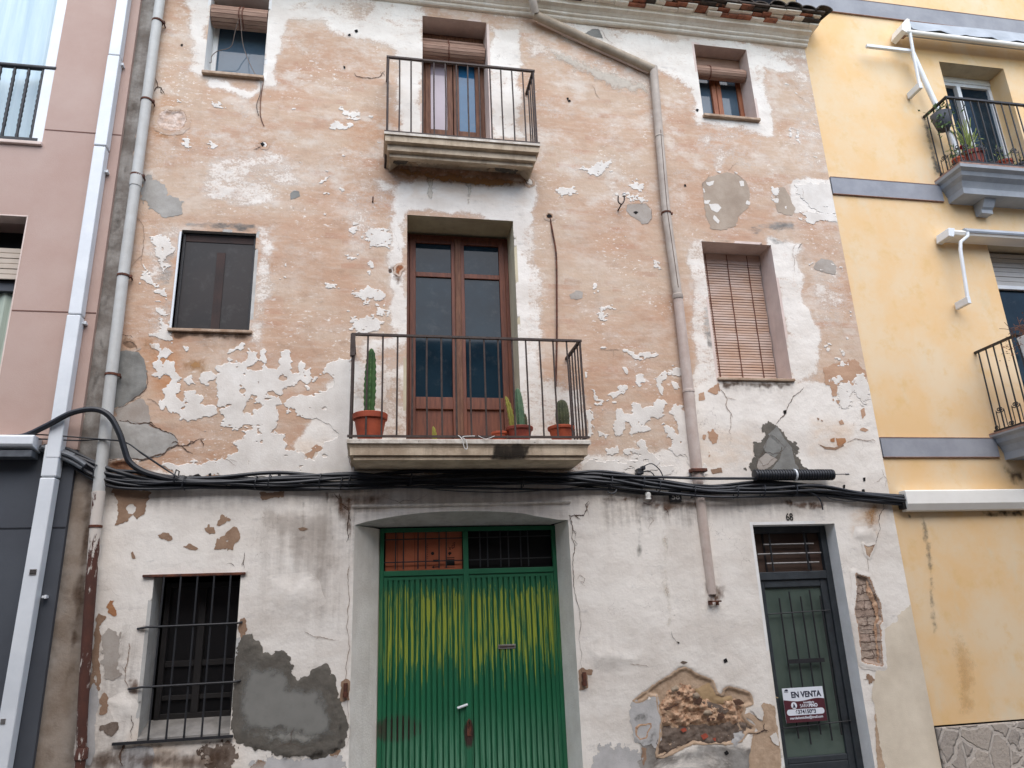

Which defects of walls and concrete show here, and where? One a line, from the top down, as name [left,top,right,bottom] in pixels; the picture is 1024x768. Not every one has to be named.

peeling [703,171,721,223]
peeling [324,222,392,337]
peeling [121,234,354,477]
crack [110,370,204,461]
peeling [583,349,722,477]
crack [758,387,804,466]
peeling [111,488,151,525]
peeling [205,514,240,551]
crack [569,501,590,672]
spalling [850,542,888,684]
peeling [196,739,347,768]
spalling [589,661,781,768]